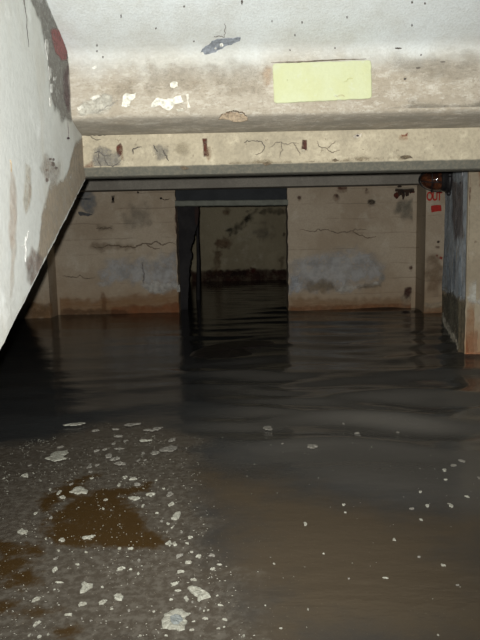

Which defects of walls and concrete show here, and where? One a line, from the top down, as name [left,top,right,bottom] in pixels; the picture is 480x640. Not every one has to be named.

peeling [200,24,241,55]
peeling [32,0,136,120]
peeling [151,94,191,112]
crack [244,140,300,155]
crack [95,227,175,249]